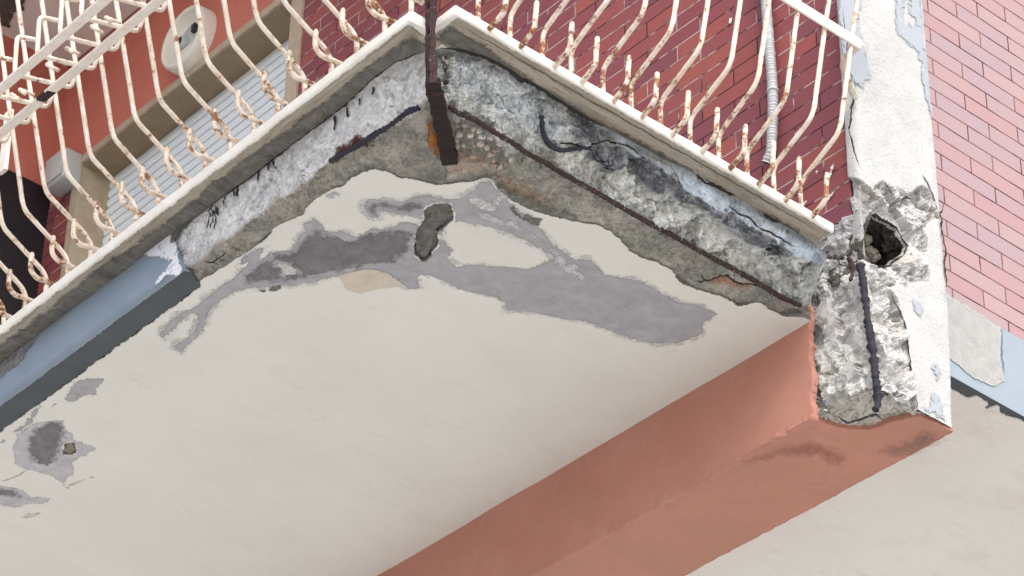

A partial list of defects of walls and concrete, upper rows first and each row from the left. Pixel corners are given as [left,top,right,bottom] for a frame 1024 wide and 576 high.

corrosion [335,135,373,155]
crack [170,48,645,244]
corrosion [426,122,439,156]
spalling [145,49,946,426]
crack [885,177,947,287]
peeling [946,293,1005,386]